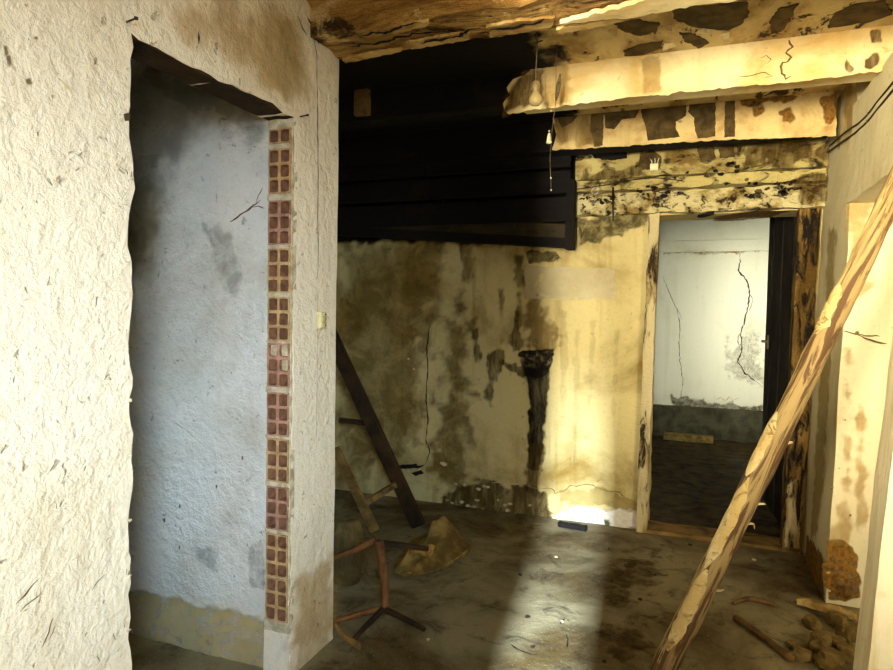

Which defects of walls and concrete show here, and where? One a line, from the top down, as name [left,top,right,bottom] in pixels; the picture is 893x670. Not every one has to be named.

peeling [503,0,893,199]
leakage [338,155,642,186]
leakage [337,236,445,455]
crack [399,324,447,476]
leakage [429,296,558,495]
crack [664,281,683,395]
crack [737,256,763,387]
spalling [442,479,637,518]
rust [805,536,861,601]